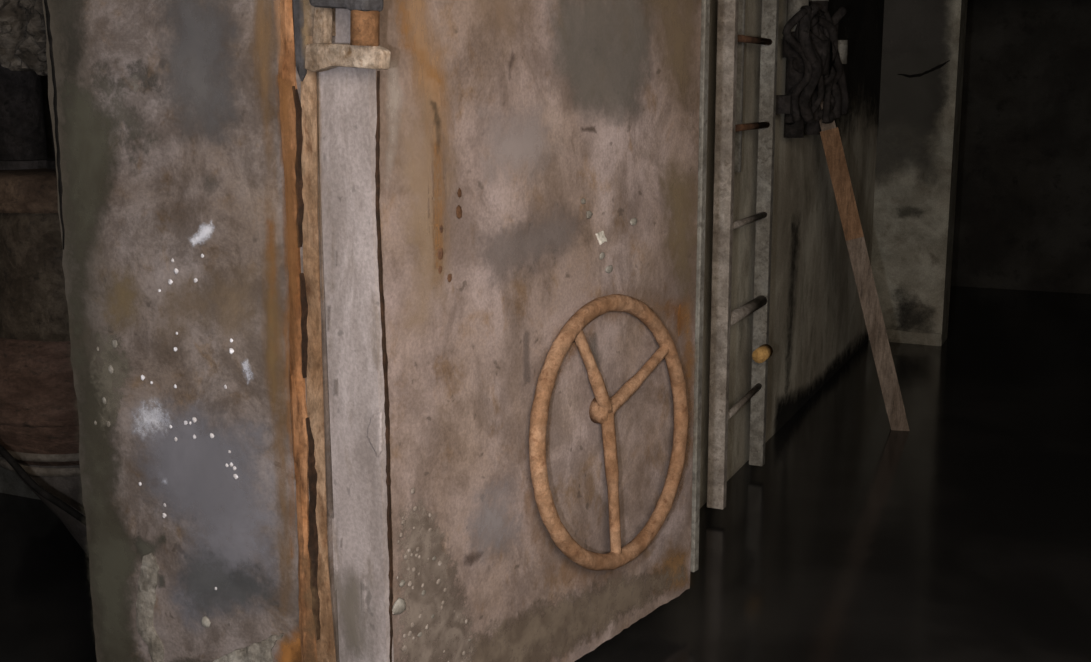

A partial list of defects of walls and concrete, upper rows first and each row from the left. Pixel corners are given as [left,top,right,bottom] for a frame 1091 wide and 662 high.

water stain [65,0,235,338]
corrosion [278,78,296,342]
water stain [557,0,697,114]
water stain [75,350,141,662]
peeling [136,536,195,662]
water stain [137,407,270,619]